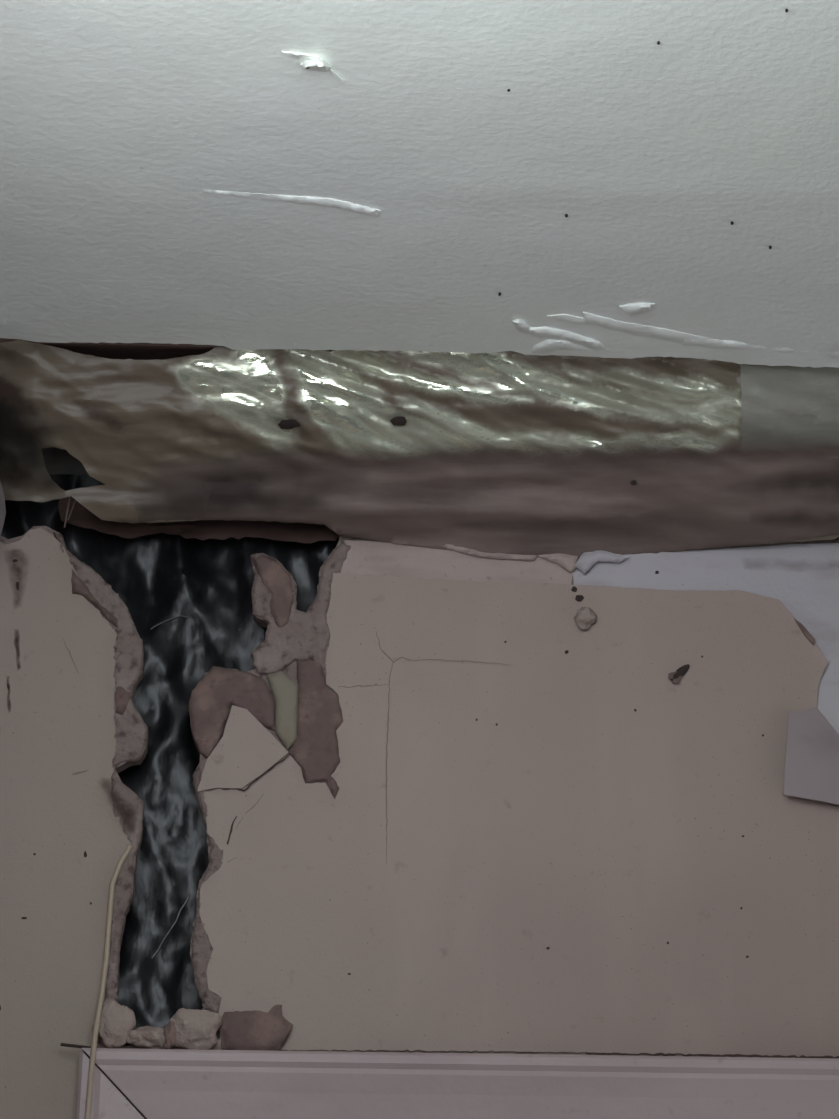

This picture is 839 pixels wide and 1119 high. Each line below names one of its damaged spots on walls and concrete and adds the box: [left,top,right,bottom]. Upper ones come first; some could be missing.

spalling [53,531,148,1003]
spalling [188,541,351,1014]
crack [338,632,505,862]
peeling [443,543,839,805]